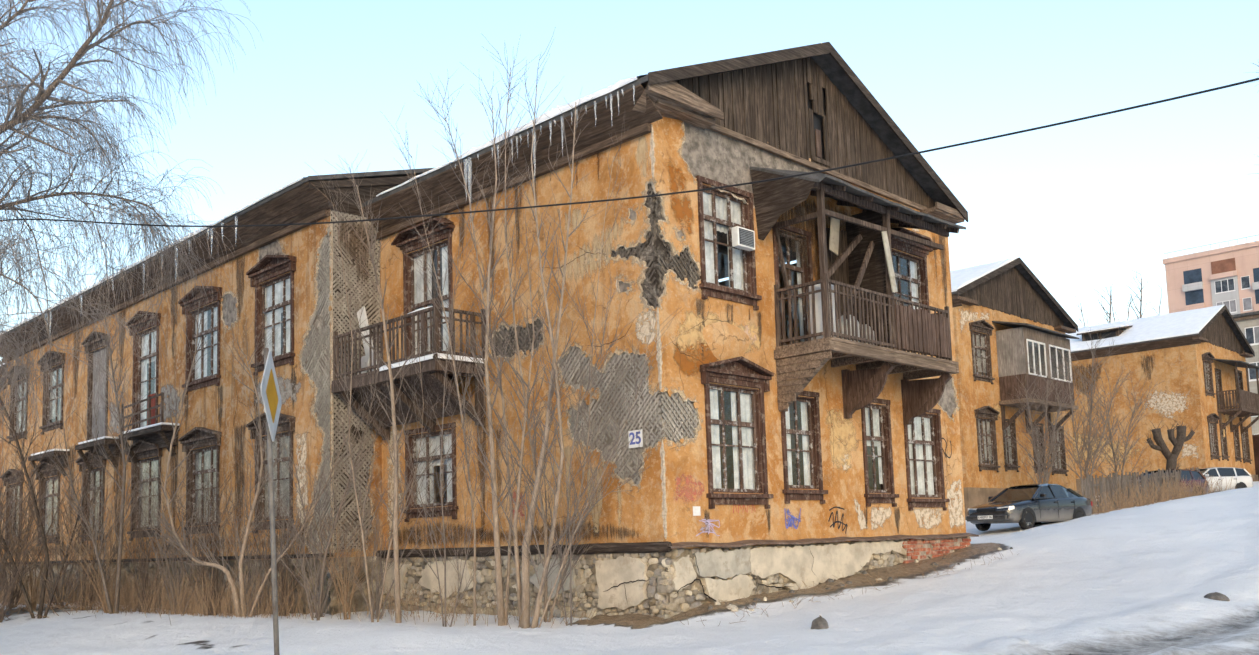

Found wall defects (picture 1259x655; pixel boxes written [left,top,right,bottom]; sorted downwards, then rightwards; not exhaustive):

spalling [256,240,286,263]
spalling [277,210,402,563]
spalling [488,315,545,362]
spalling [557,125,702,539]